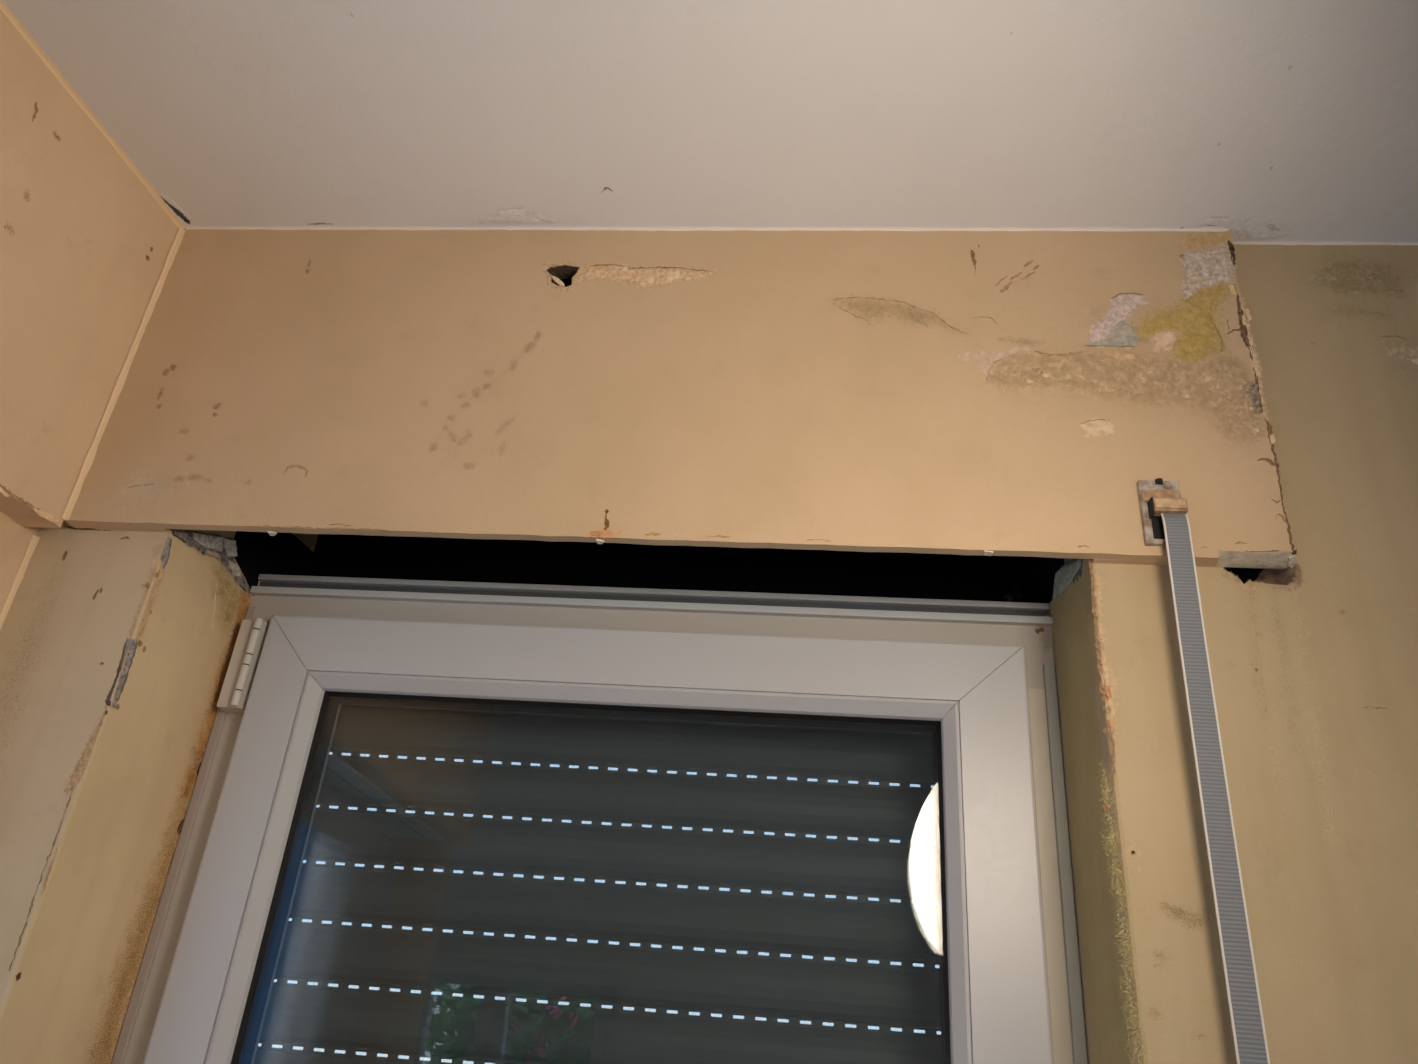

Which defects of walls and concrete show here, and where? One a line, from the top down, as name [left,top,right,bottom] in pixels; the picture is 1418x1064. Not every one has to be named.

peeling [546,262,717,290]
peeling [1177,213,1294,300]
peeling [1081,291,1149,349]
crack [1226,241,1295,553]
peeling [0,484,61,528]
flaking render [9,523,386,971]